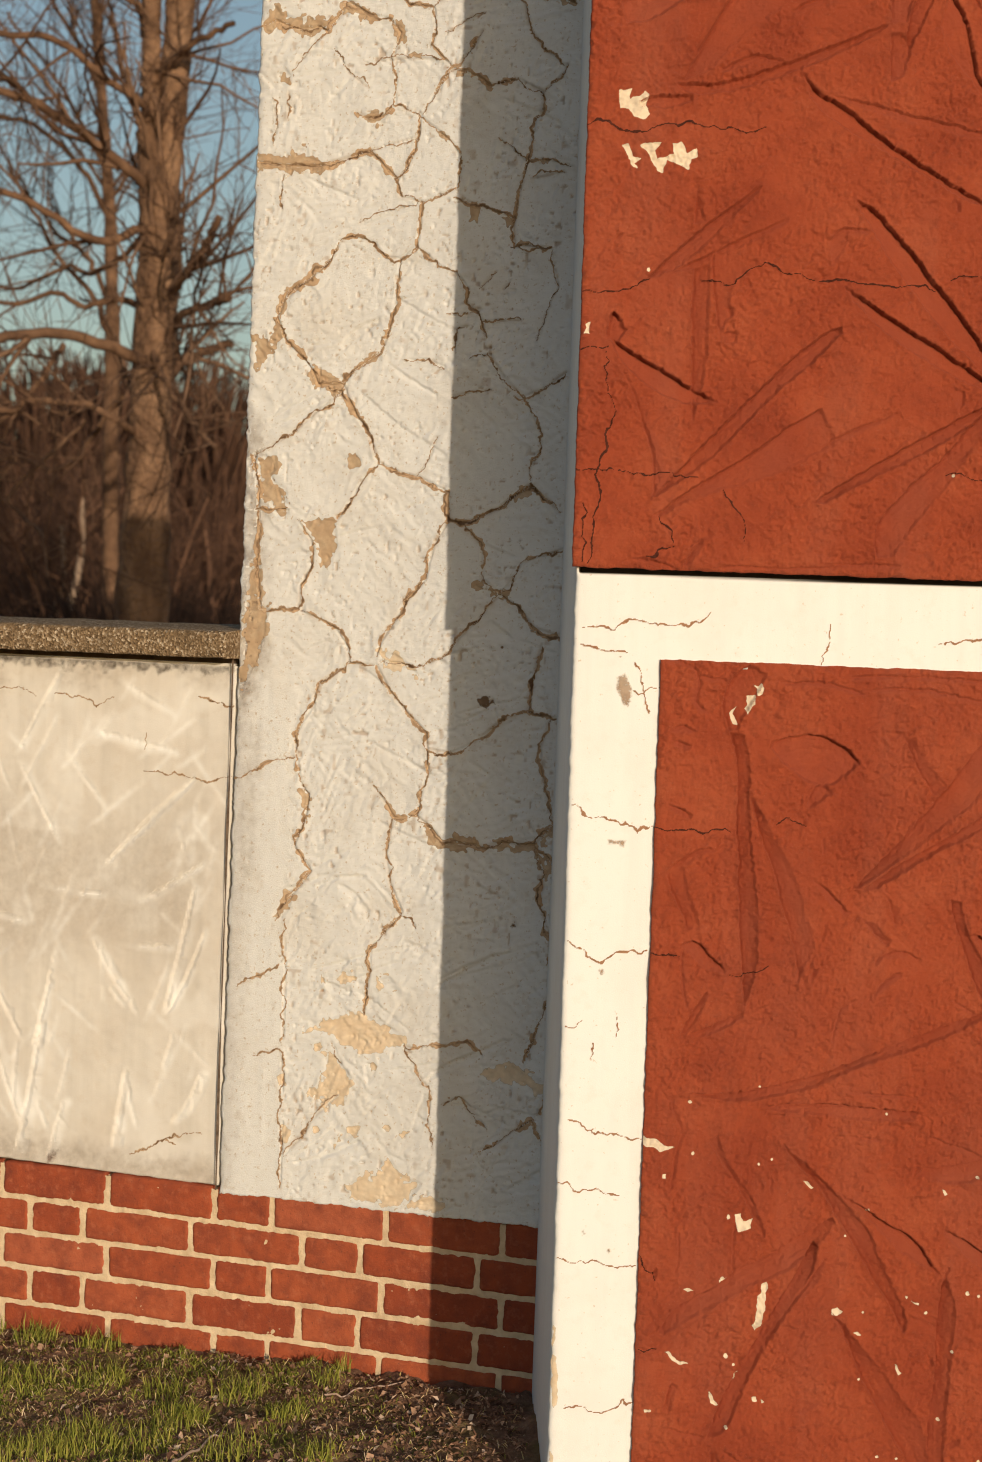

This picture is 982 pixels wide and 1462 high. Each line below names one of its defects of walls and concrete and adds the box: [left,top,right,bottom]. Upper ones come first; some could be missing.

spalling [619,88,650,119]
spalling [622,142,698,173]
peeling [256,455,337,568]
crack [144,0,766,1188]
peeling [238,559,272,691]
crack [940,638,982,646]
spalling [729,683,764,725]
peeling [302,1010,407,1133]
crack [131,1132,201,1154]
crack [558,1181,620,1196]
crack [557,1255,655,1281]
crack [563,1399,633,1414]